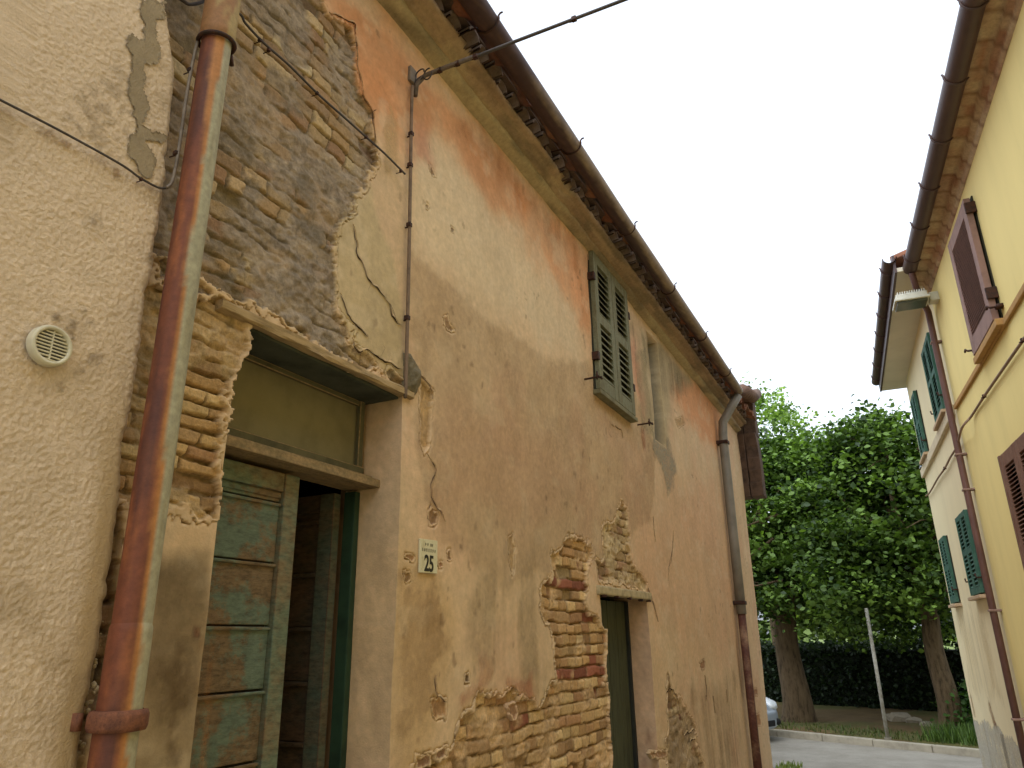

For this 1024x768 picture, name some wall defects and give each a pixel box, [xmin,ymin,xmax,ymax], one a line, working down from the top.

flaking render [76,0,204,768]
flaking render [168,0,404,525]
crack [353,224,401,325]
crack [426,453,445,521]
flaking render [409,498,649,768]
flaking render [646,673,705,768]